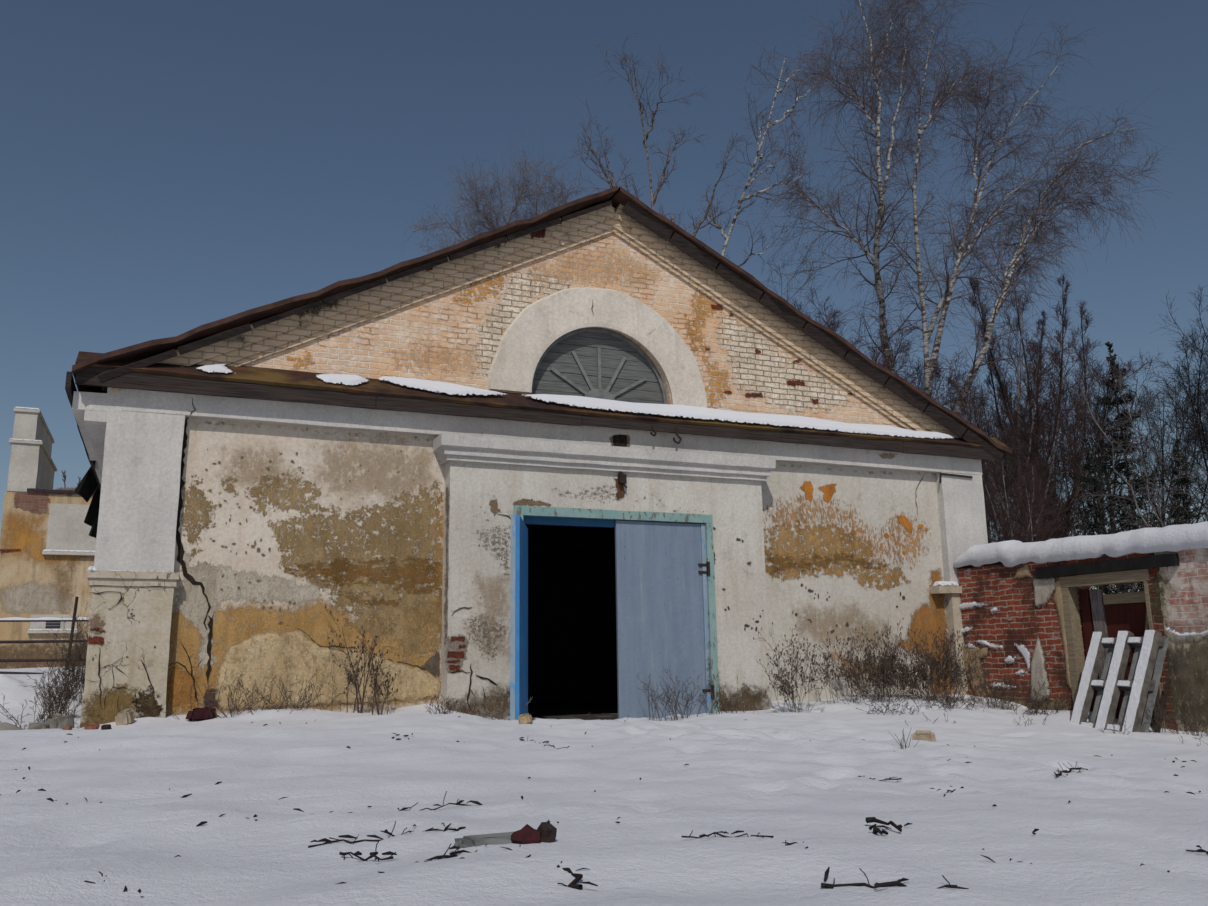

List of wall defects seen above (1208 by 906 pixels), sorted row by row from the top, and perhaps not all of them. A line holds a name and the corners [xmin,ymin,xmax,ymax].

peeling [705,297,856,416]
water stain [5,515,89,599]
crack [86,398,214,712]
peeling [180,448,505,677]
peeling [747,481,930,608]
flaking render [1147,548,1208,634]
flaking render [203,688,220,708]